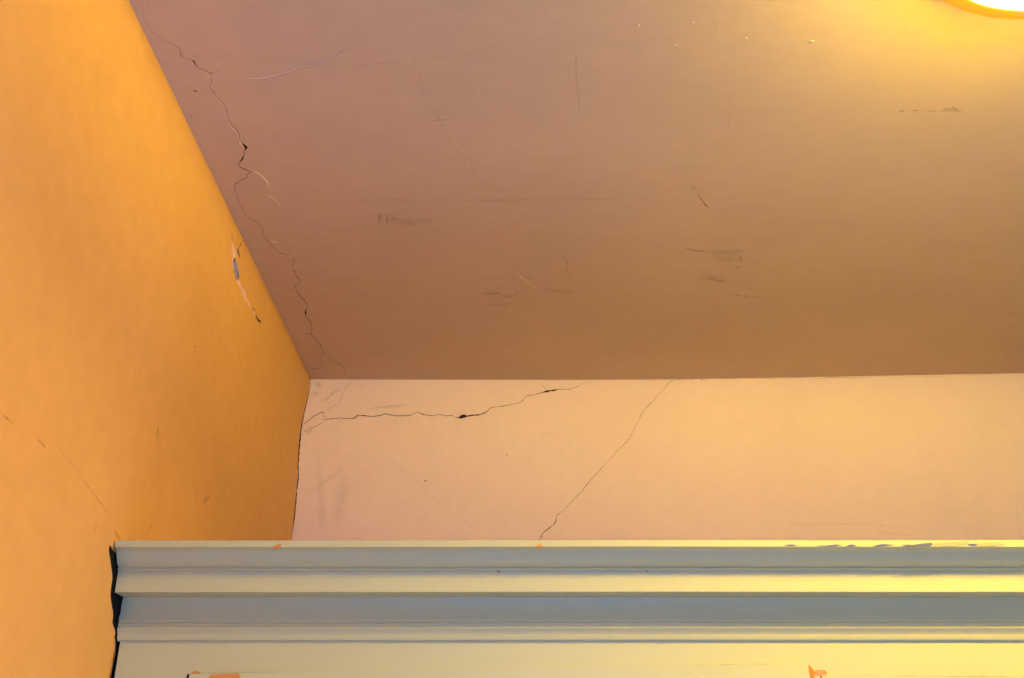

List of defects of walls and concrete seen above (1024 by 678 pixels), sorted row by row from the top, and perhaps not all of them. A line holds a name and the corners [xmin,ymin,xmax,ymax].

spalling [231,242,261,323]
crack [170,43,578,535]
crack [540,379,702,538]